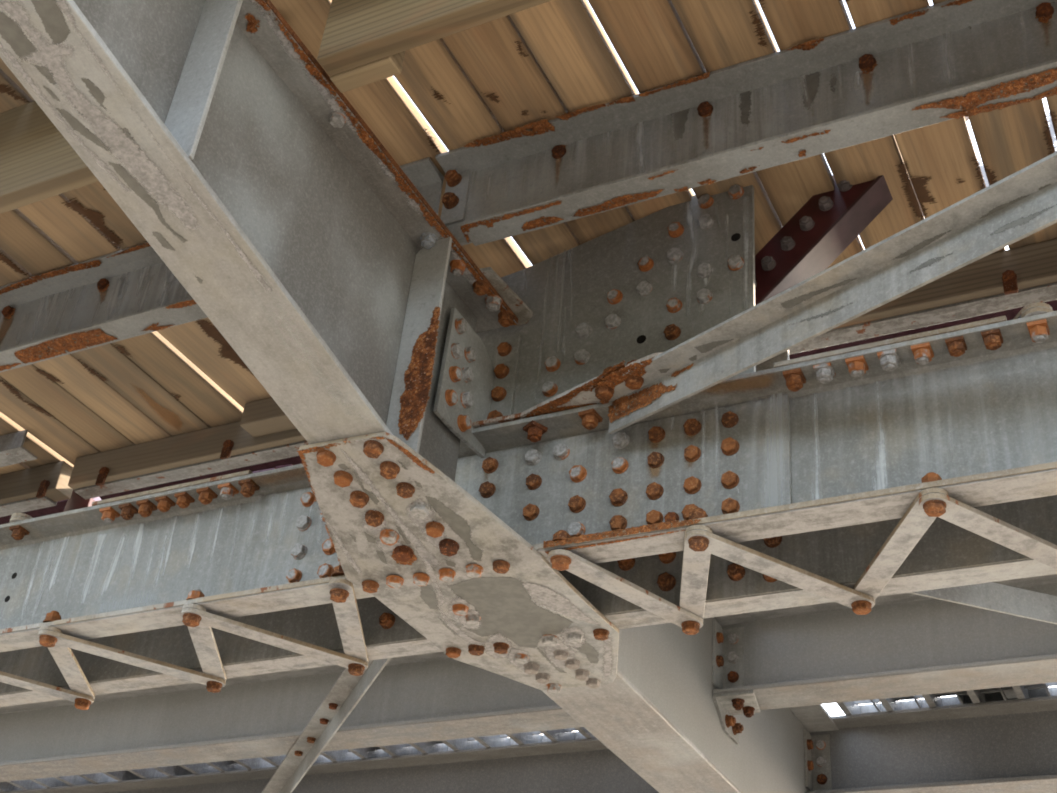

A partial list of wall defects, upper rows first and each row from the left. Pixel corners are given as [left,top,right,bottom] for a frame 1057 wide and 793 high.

corrosion [889,0,973,25]
corrosion [912,68,1057,119]
corrosion [245,0,716,312]
corrosion [781,130,831,157]
corrosion [0,242,151,295]
corrosion [0,329,117,371]
corrosion [142,322,175,331]
corrosion [166,300,197,309]
corrosion [369,307,440,474]
corrosion [523,358,694,423]
corrosion [266,441,351,561]
corrosion [543,519,701,554]